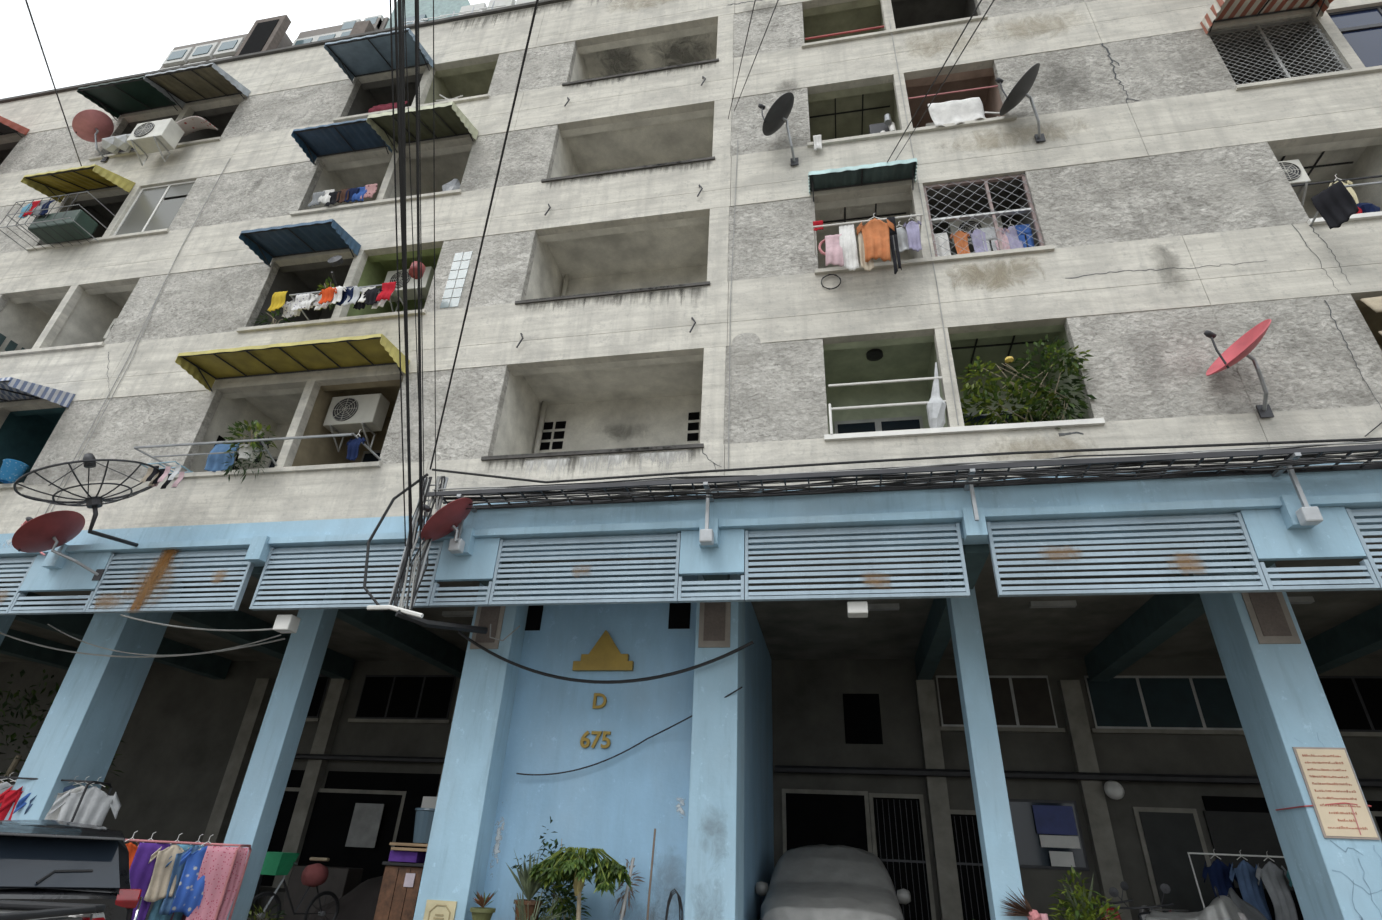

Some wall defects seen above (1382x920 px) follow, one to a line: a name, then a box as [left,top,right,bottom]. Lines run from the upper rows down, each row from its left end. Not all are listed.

crack [1101,43,1139,103]
corrosion [130,549,178,611]
crack [1330,840,1382,920]